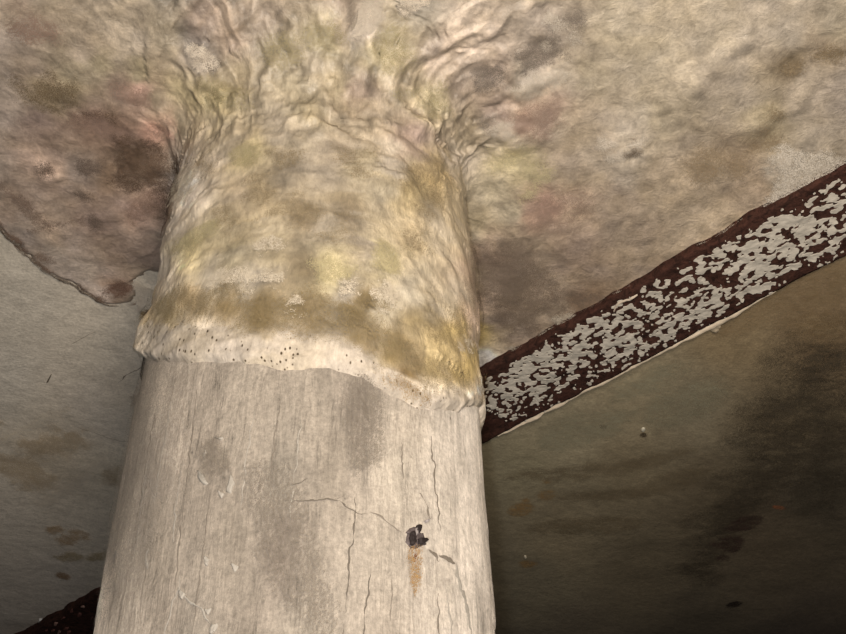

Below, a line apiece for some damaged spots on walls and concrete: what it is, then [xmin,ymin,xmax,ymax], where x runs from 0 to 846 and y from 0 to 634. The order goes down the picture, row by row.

damp [0,68,201,241]
damp [194,265,288,295]
peeling [132,179,846,436]
spalling [195,435,235,498]
crack [293,478,371,634]
corrosion [406,544,423,596]